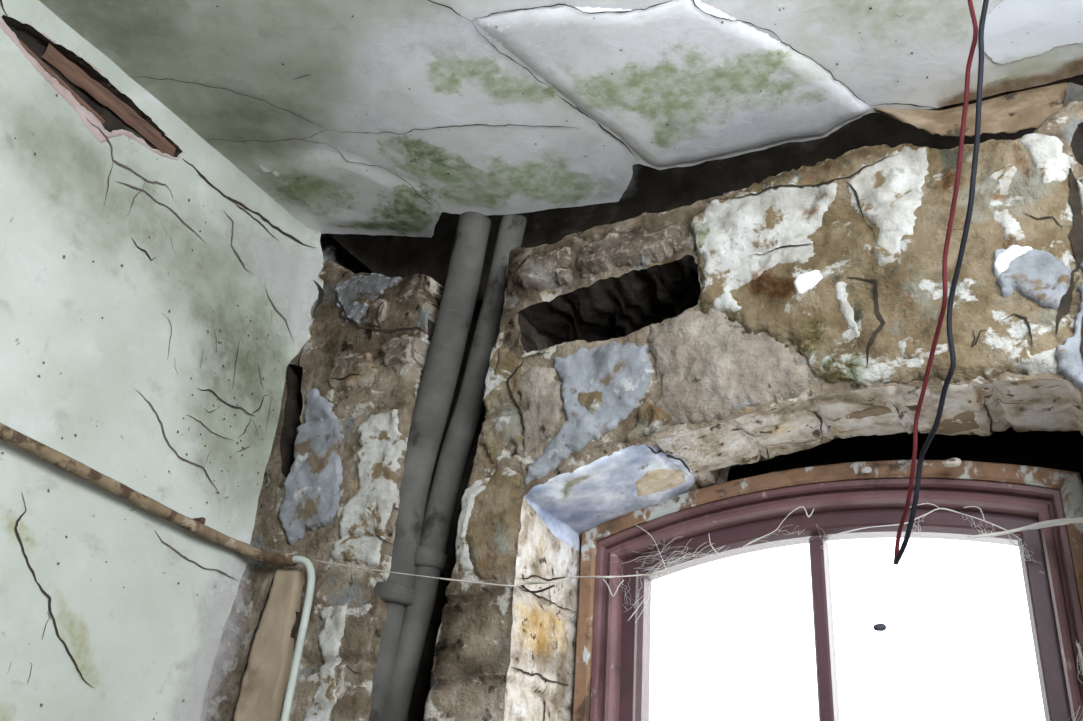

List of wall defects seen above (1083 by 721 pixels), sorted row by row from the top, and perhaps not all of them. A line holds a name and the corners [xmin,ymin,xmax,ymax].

flaking render [0,17,185,161]
crack [86,118,202,261]
crack [135,314,272,494]
crack [183,159,315,369]
flaking render [278,335,430,567]
flaking render [334,273,402,328]
crack [140,0,938,210]
flaking render [455,82,1083,580]
crack [716,154,897,245]
crack [15,492,94,688]
crack [156,532,238,581]
flaking render [304,604,347,721]